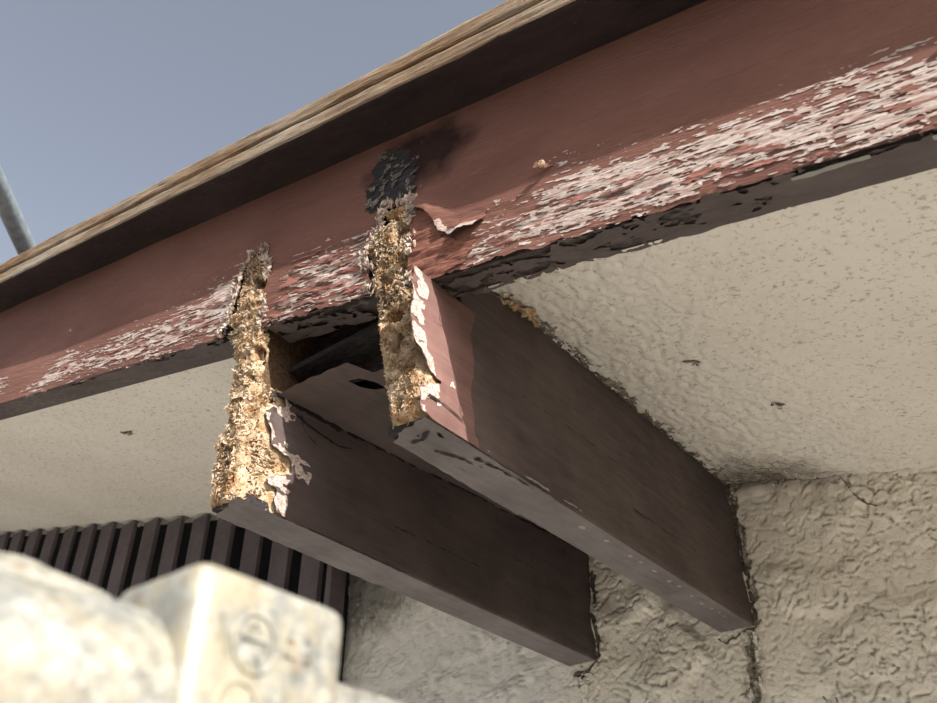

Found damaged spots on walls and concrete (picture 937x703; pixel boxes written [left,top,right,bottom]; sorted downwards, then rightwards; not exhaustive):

peeling [460,37,937,270]
peeling [19,254,245,396]
crack [496,292,765,703]
crack [817,475,877,506]